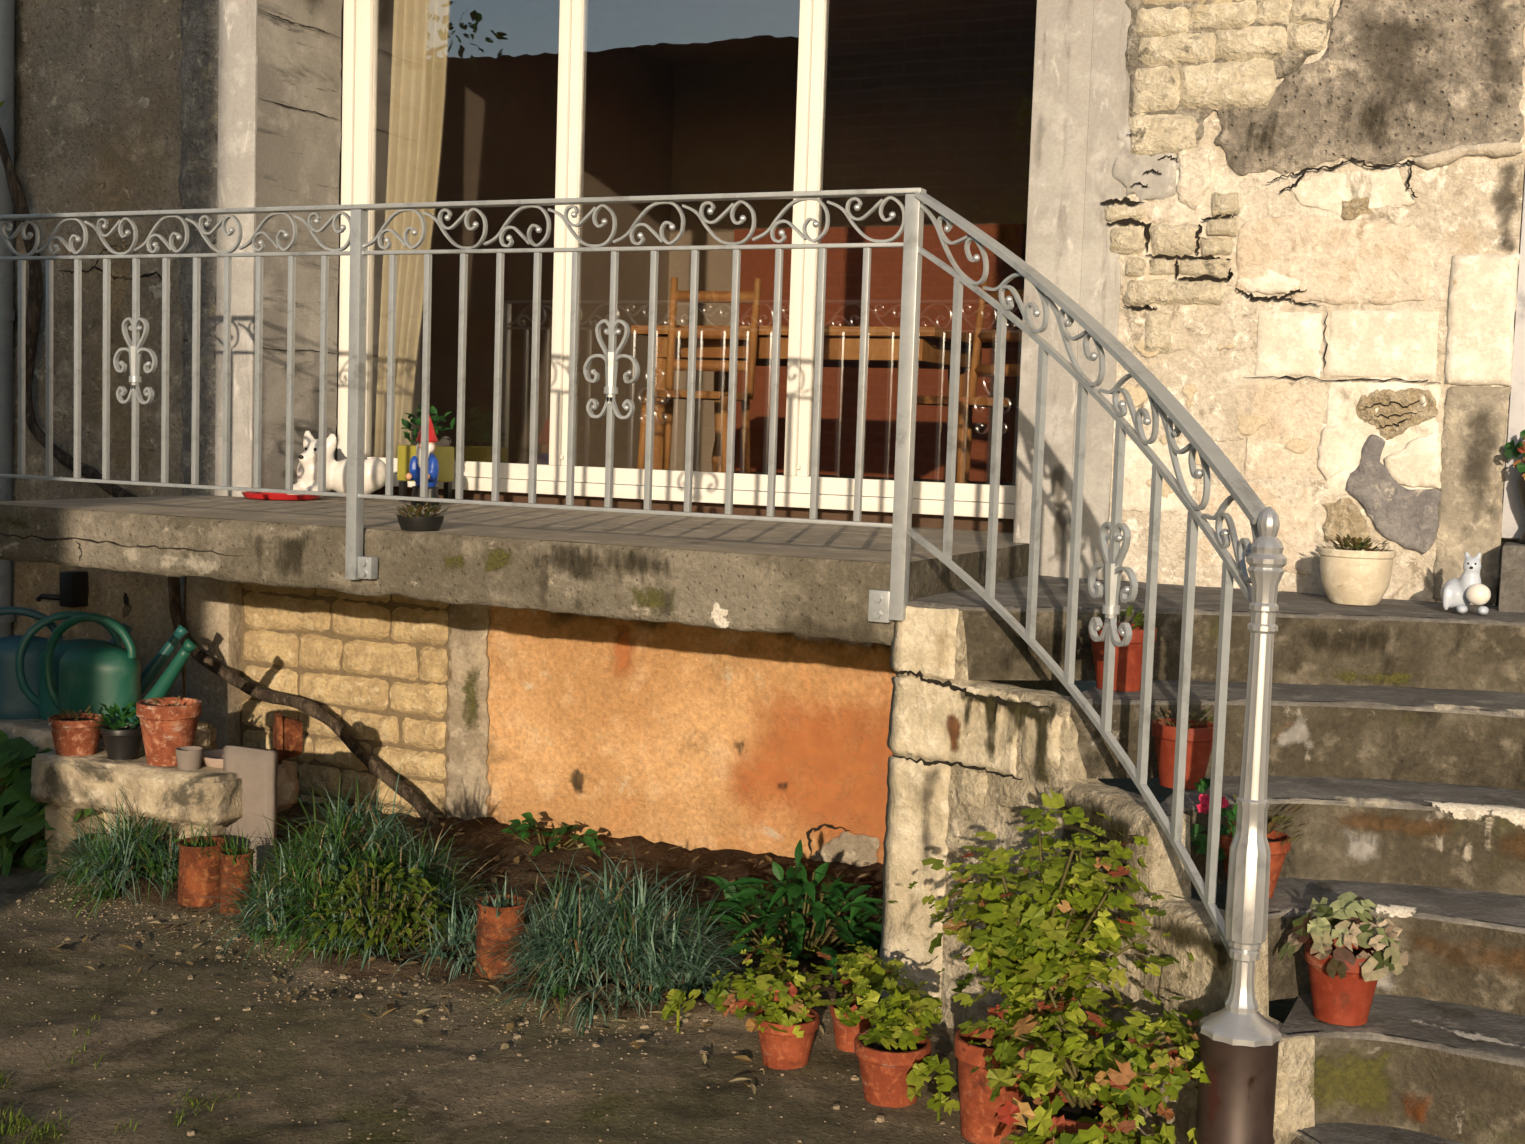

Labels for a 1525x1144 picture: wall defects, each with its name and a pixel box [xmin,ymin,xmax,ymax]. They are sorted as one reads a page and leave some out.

water stain [1373,23,1430,111]
peeling [1100,0,1525,358]
crack [1267,157,1418,198]
peeling [1124,384,1148,406]
peeling [1146,478,1174,497]
water stain [538,548,668,592]
crack [895,670,1050,709]
corrosion [736,709,893,847]
crack [891,754,1023,780]